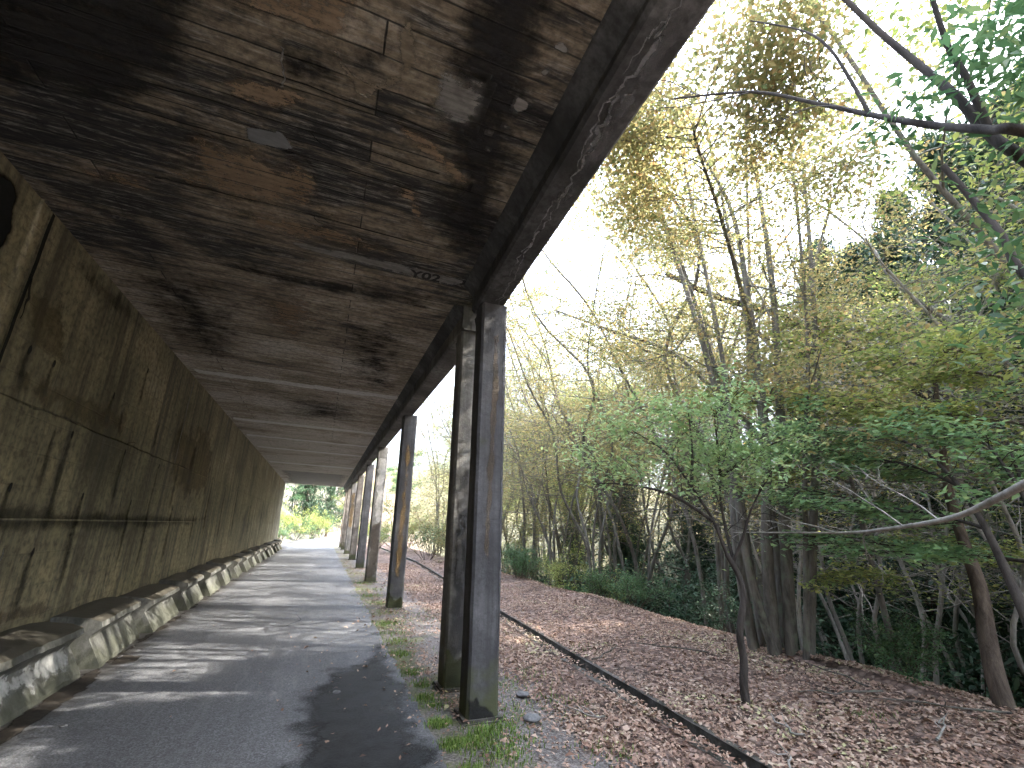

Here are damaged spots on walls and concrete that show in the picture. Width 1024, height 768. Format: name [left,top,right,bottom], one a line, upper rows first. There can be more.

peeling [168,135,333,216]
crack [496,0,683,305]